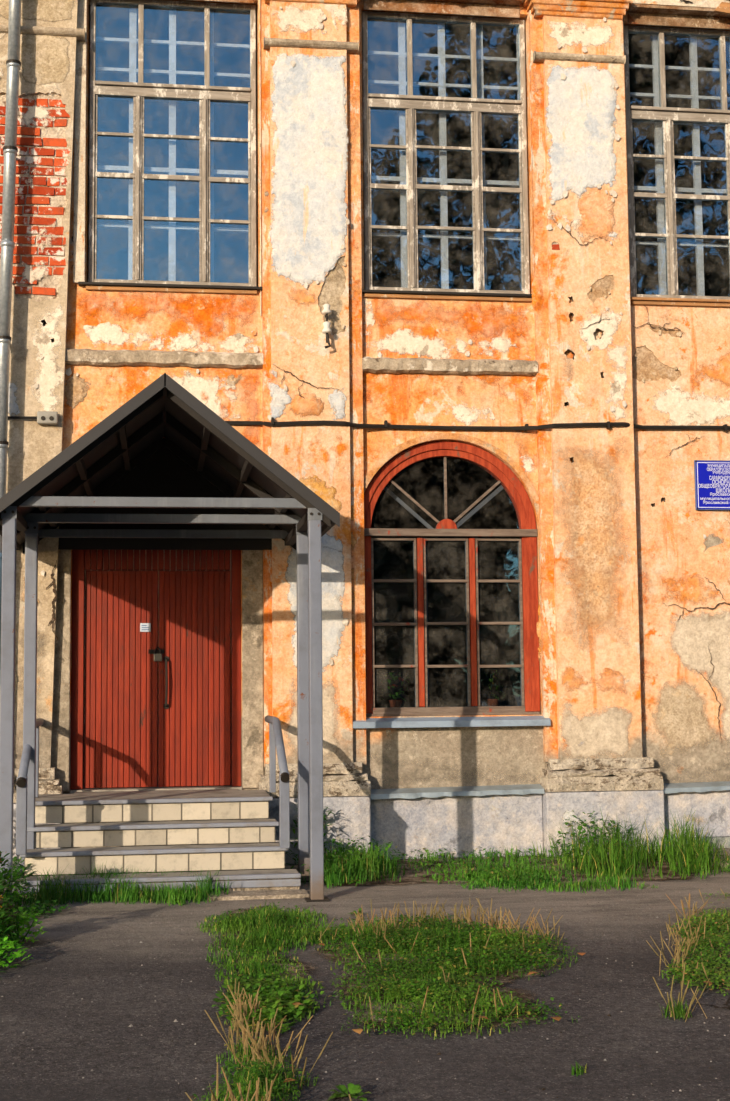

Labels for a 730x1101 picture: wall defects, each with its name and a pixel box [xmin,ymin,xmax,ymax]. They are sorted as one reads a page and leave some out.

peeling [548,17,614,53]
flaking render [0,86,90,416]
peeling [264,53,349,335]
peeling [545,65,621,250]
peeling [579,275,730,426]
peeling [285,548,297,668]
peeling [321,533,348,672]
crack [668,575,730,620]
crack [697,650,722,745]